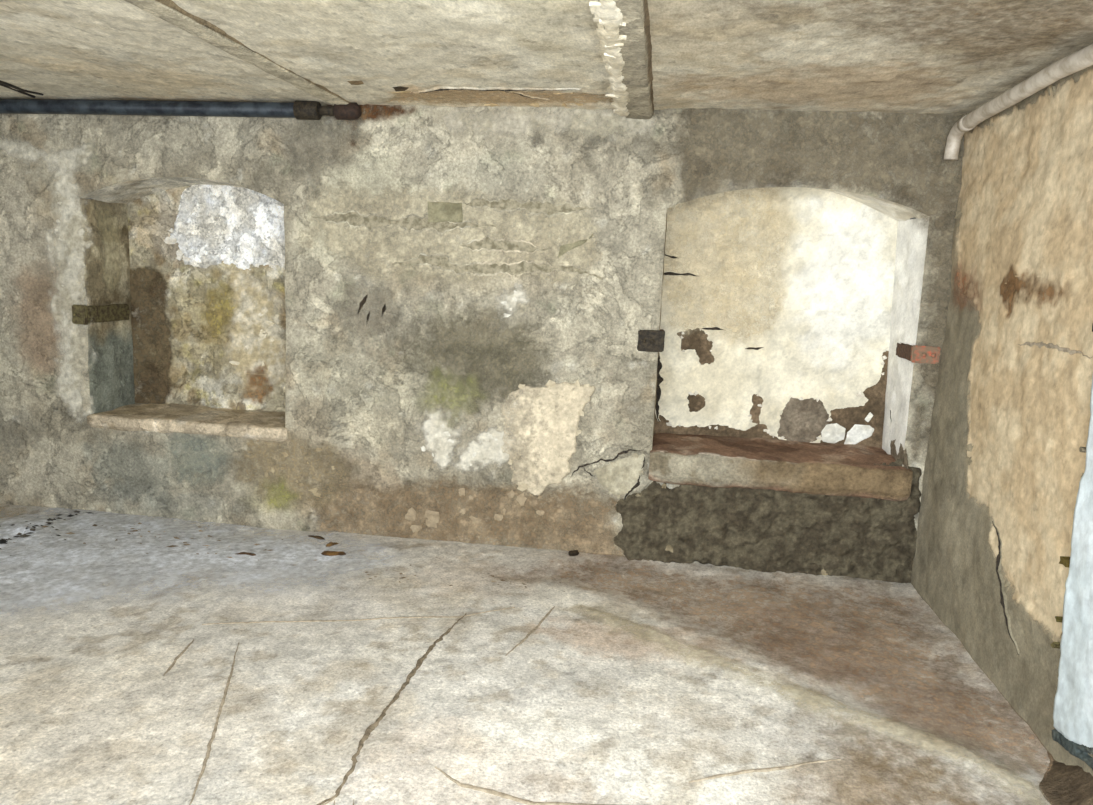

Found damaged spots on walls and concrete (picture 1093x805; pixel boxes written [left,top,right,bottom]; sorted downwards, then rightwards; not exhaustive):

rust [328,104,414,145]
rust [1000,266,1063,317]
water stain [417,311,536,411]
peeling [677,328,715,365]
flaking render [236,351,922,583]
crack [570,352,668,506]
crack [505,606,555,656]
crack [992,520,1020,655]
crack [163,607,515,805]